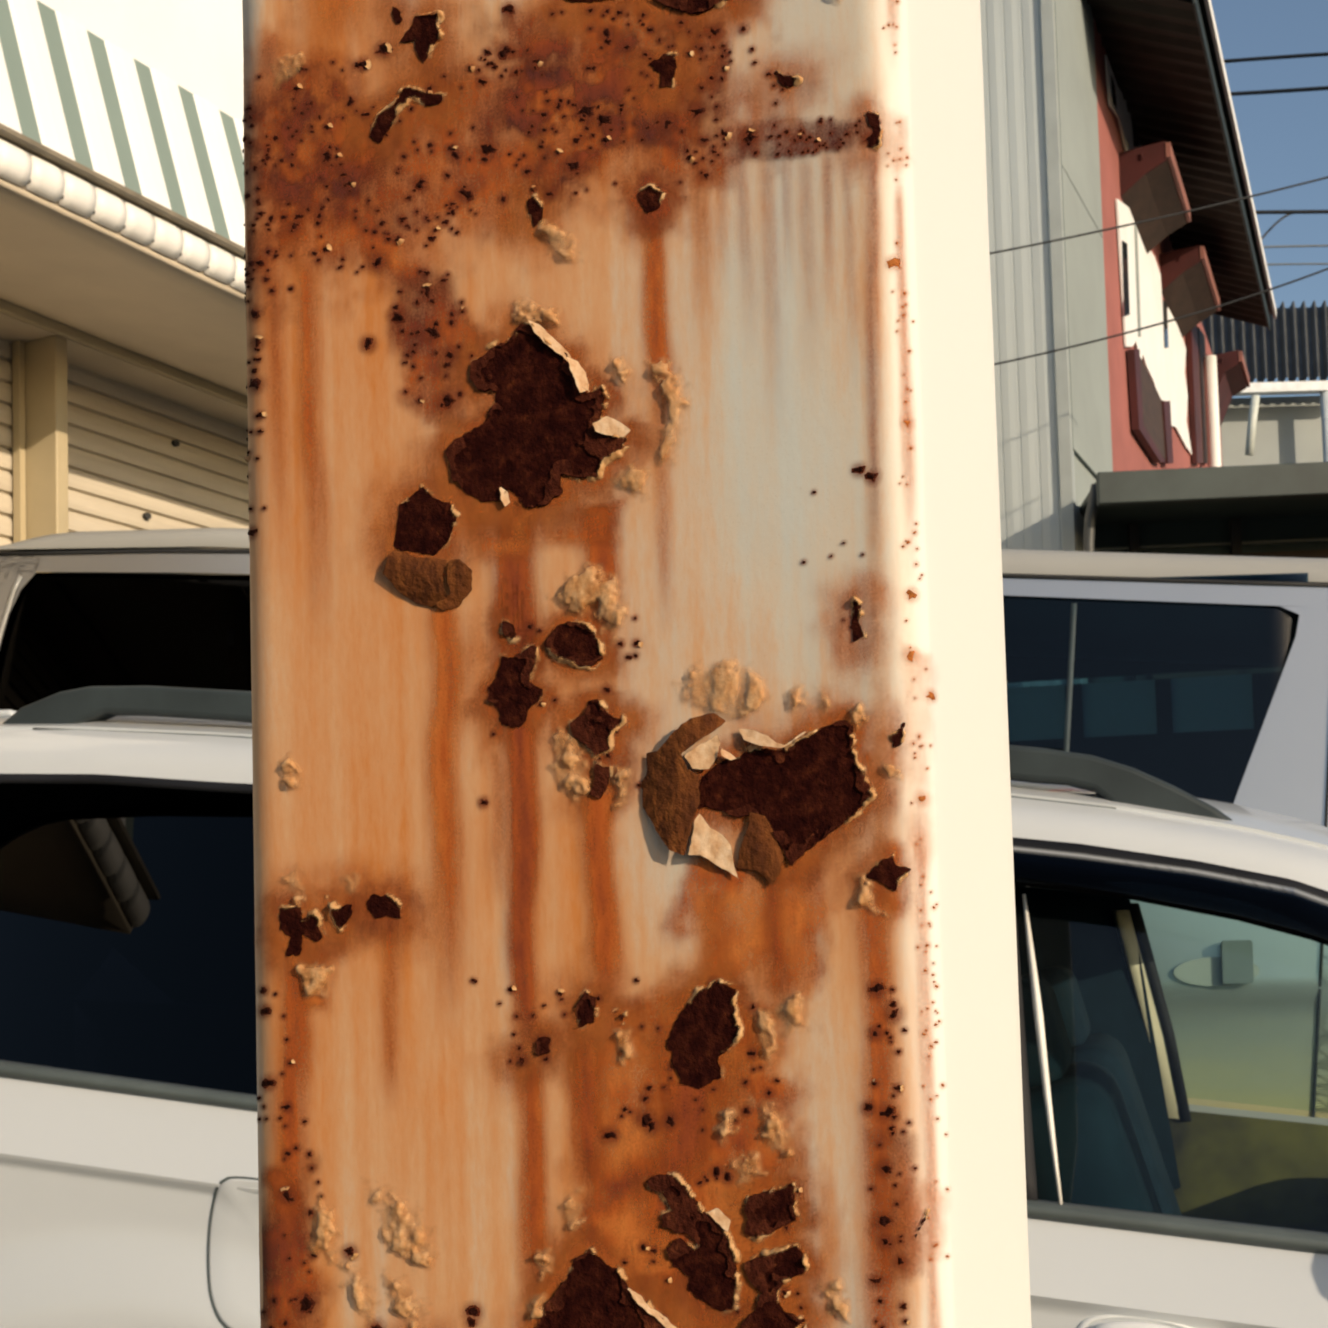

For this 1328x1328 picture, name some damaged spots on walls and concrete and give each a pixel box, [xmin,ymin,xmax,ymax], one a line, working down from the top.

corrosion [244,0,866,511]
spalling [242,0,908,273]
peeling [375,268,649,610]
corrosion [259,937,326,1328]
peeling [268,880,412,970]
corrosion [499,725,540,1030]
corrosion [583,789,621,985]
peeling [526,1230,694,1328]
peeling [508,969,767,1141]
corrosion [519,845,827,1328]
peeling [469,606,892,885]
corrosion [858,898,914,1328]